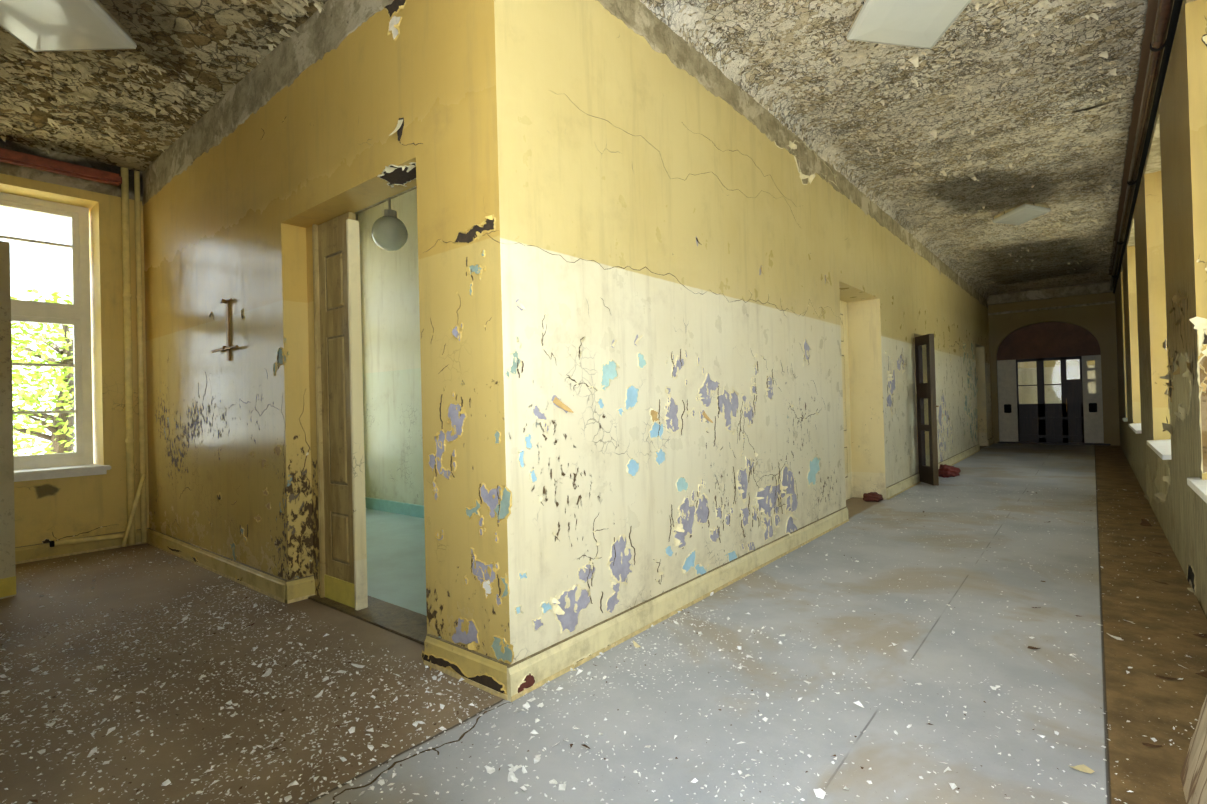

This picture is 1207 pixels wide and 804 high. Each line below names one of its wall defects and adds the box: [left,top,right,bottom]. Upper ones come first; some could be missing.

peeling [249,0,324,58]
flaking render [384,0,407,41]
peeling [0,47,215,155]
peeling [389,117,404,141]
flaking render [377,162,416,188]
crack [555,93,795,216]
peeling [754,0,1132,286]
peeling [454,214,496,297]
peeling [428,391,467,500]
peeling [532,395,574,434]
spalling [0,457,1207,804]
crack [333,702,511,804]